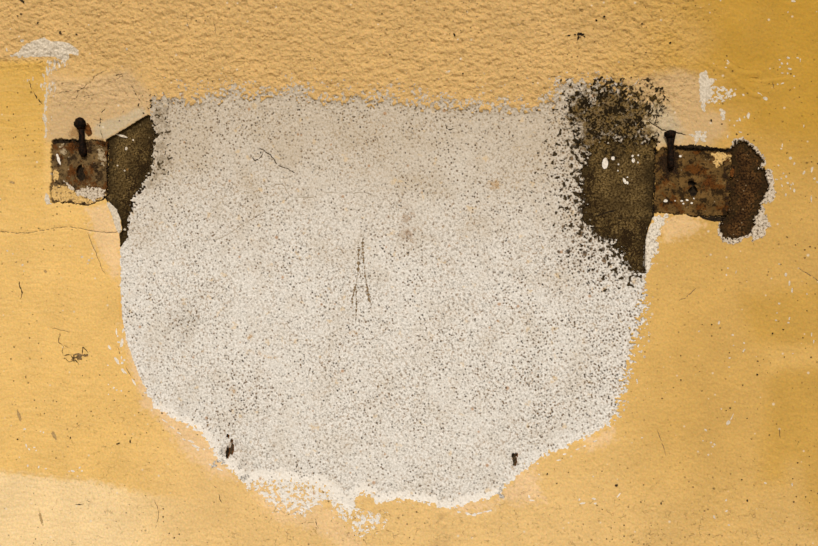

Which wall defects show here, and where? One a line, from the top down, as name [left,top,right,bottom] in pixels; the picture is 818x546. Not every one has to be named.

corrosion [61,121,106,156]
crack [0,227,118,272]
peeling [105,67,669,539]